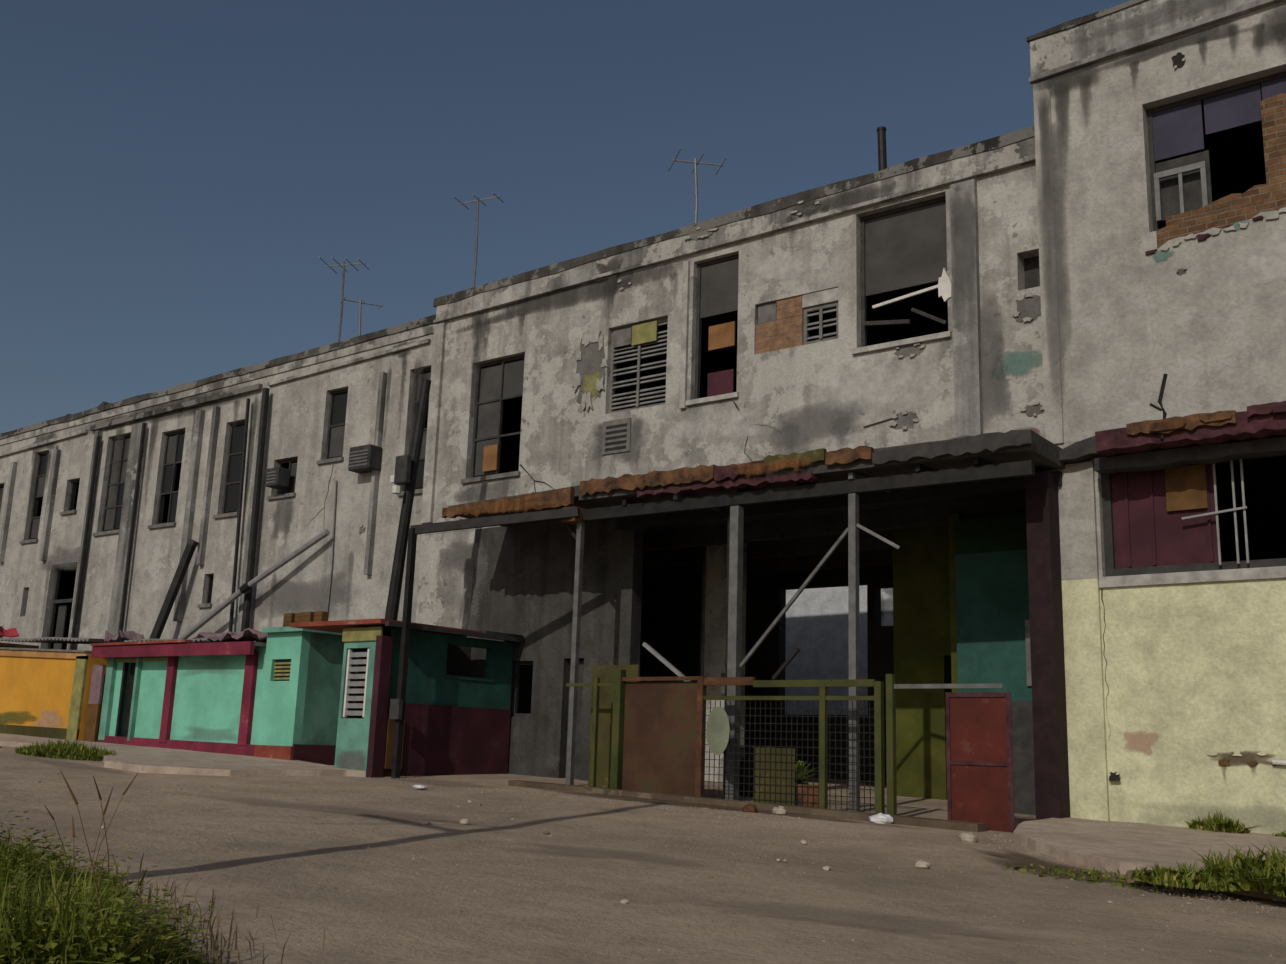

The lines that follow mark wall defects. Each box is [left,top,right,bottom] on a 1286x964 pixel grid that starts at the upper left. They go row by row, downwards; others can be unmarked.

water stain [1115,22,1235,75]
water stain [1255,9,1286,44]
spalling [1145,191,1286,276]
spalling [571,331,608,412]
peeling [1001,352,1041,375]
crack [1101,589,1111,738]
peeling [1125,733,1156,754]
peeling [1207,750,1282,768]